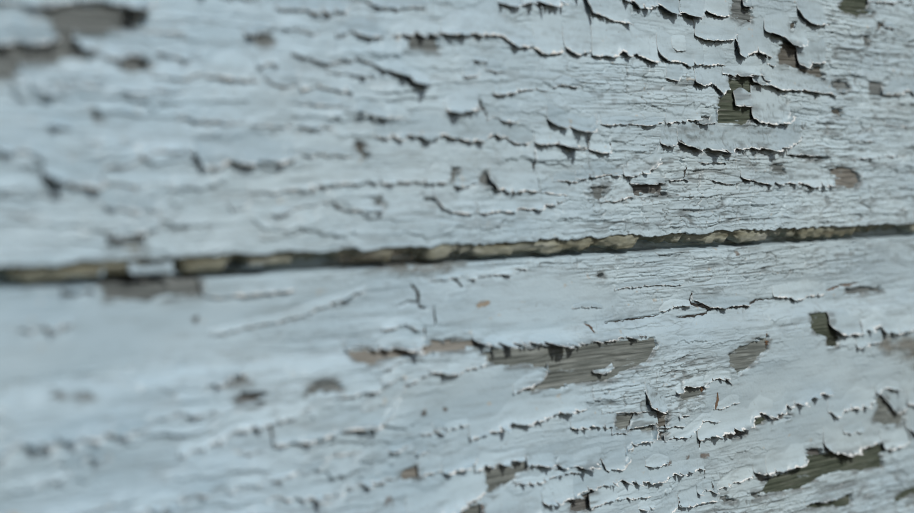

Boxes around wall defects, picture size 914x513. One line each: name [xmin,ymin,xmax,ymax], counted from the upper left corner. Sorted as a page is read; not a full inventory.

peeling [868,74,914,96]
peeling [0,0,909,250]
peeling [50,260,296,302]
peeling [429,264,528,282]
peeling [772,279,880,301]
peeling [809,306,914,349]
peeling [0,330,914,513]